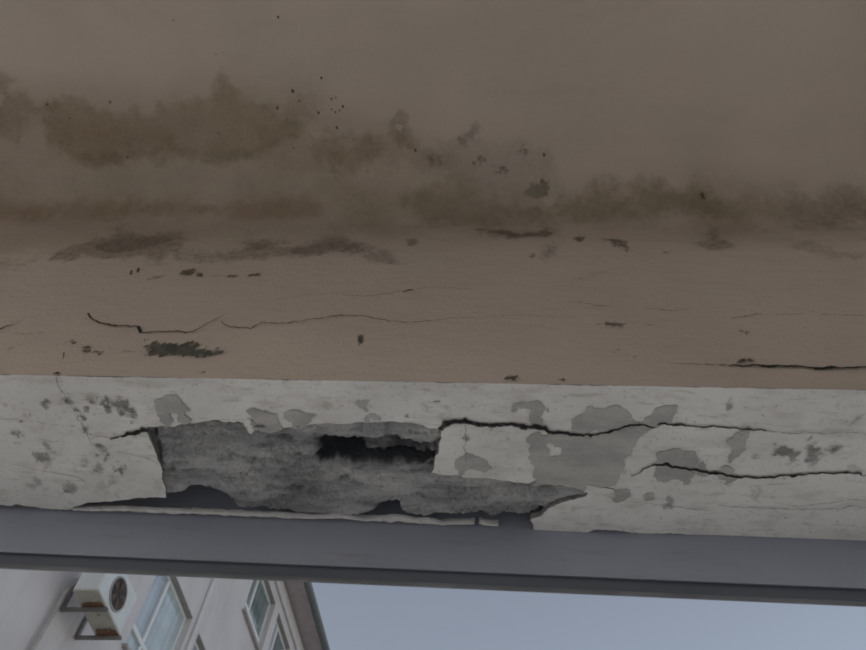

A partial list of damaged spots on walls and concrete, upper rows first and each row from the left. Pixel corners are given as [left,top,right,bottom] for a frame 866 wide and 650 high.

crack [87,286,470,333]
crack [674,362,866,370]
spalling [149,395,677,516]
crack [438,418,857,462]
peeling [654,427,751,485]
crack [631,462,866,479]
peeling [773,437,842,465]